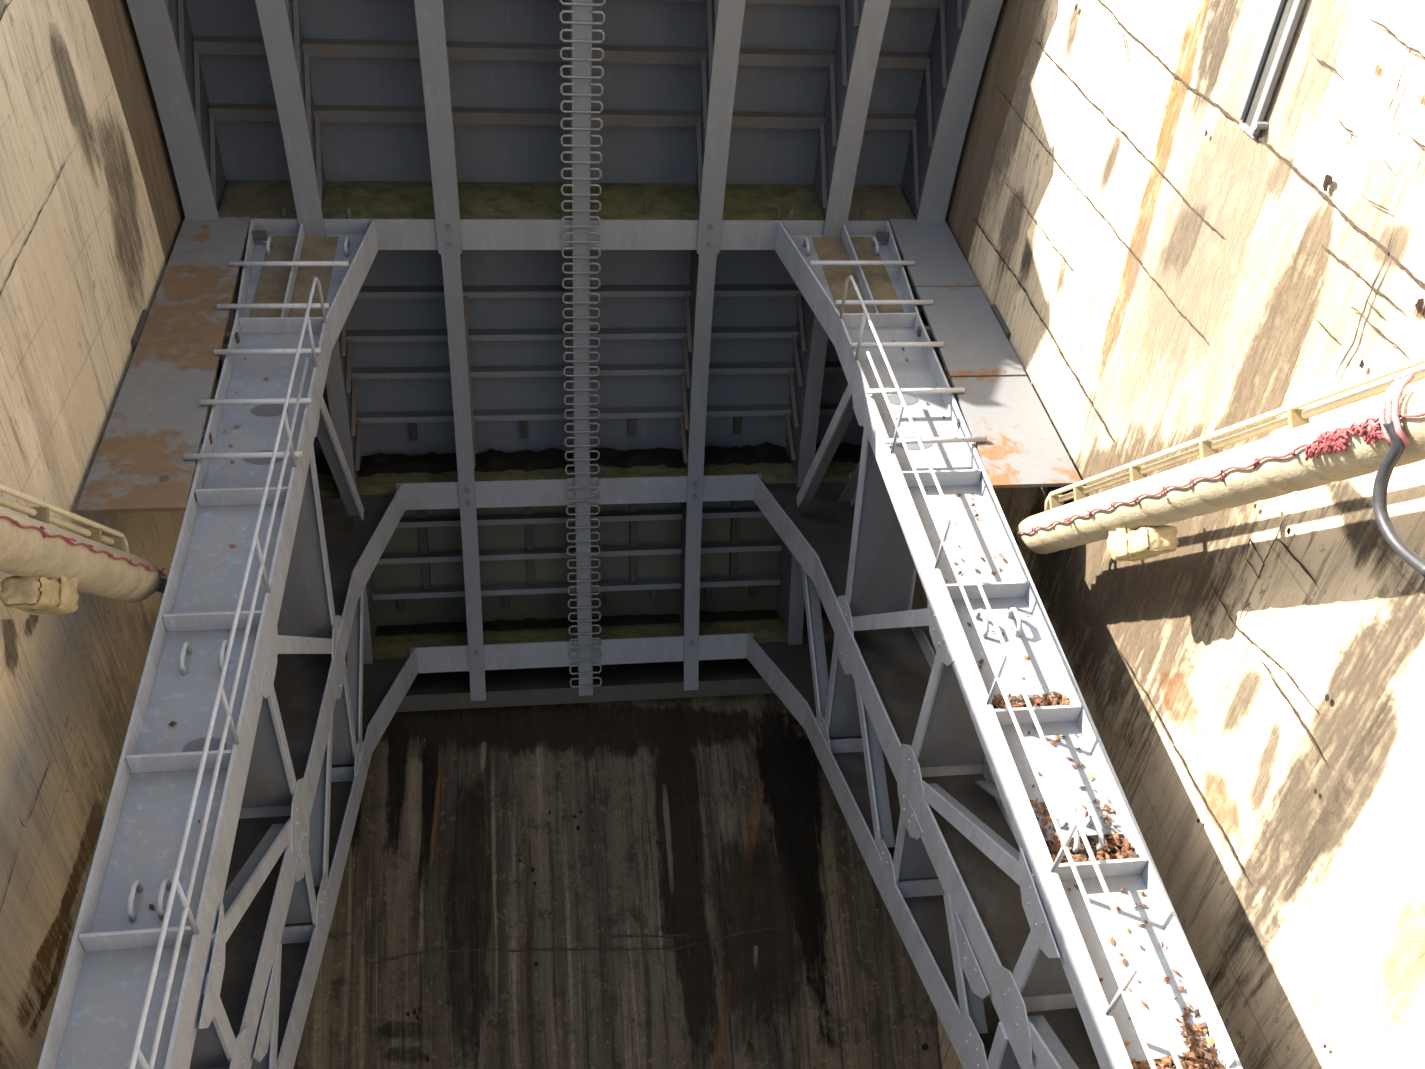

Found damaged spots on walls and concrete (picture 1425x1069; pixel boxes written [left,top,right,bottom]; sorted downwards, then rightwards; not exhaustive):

crack [973,219,1114,442]
crack [1033,38,1223,237]
rust [1091,0,1212,396]
water stain [1030,0,1354,516]
crack [1098,0,1425,379]
rust [18,788,106,1038]
water stain [381,703,834,1069]
water stain [1026,503,1259,750]
crack [1111,641,1250,883]
crack [1211,518,1327,766]
water stain [1207,571,1425,1007]
water stain [1326,480,1395,572]